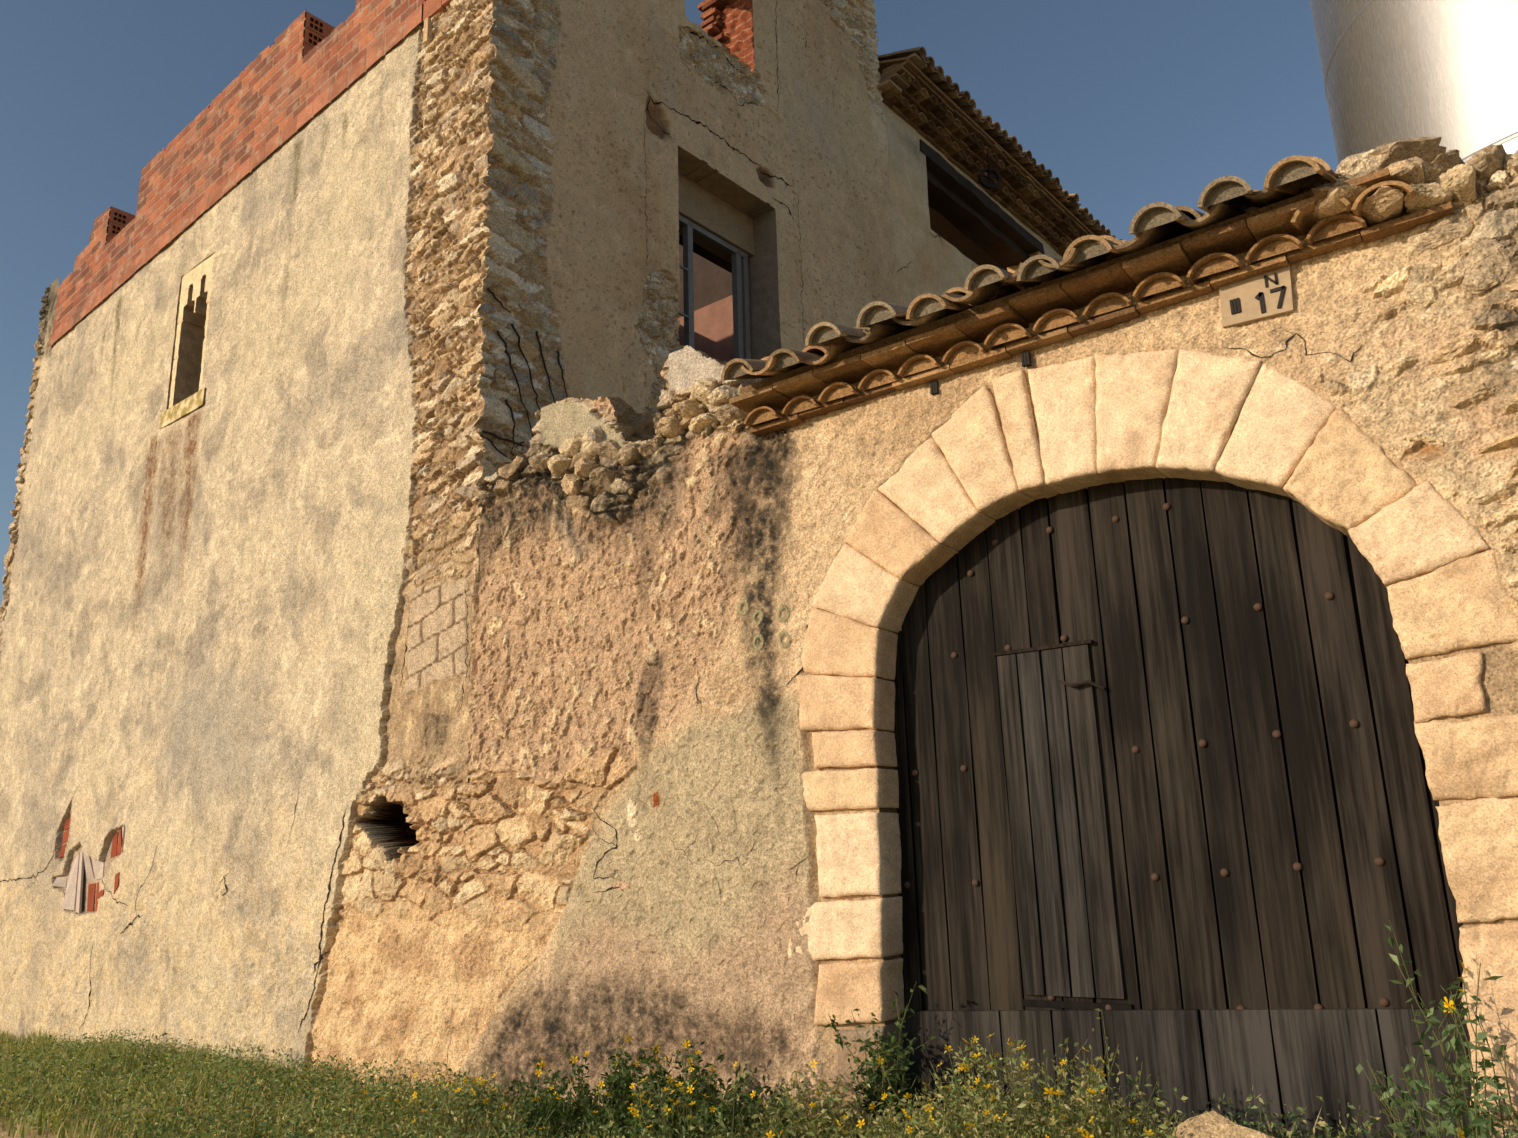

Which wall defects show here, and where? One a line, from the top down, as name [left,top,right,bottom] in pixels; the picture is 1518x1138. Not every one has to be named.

spalling [403,0,784,612]
crack [644,6,807,321]
crack [1227,327,1362,363]
rust [140,414,197,577]
leakage [726,429,793,714]
spalling [50,794,126,920]
crack [297,811,346,1033]
spalling [304,749,636,1098]